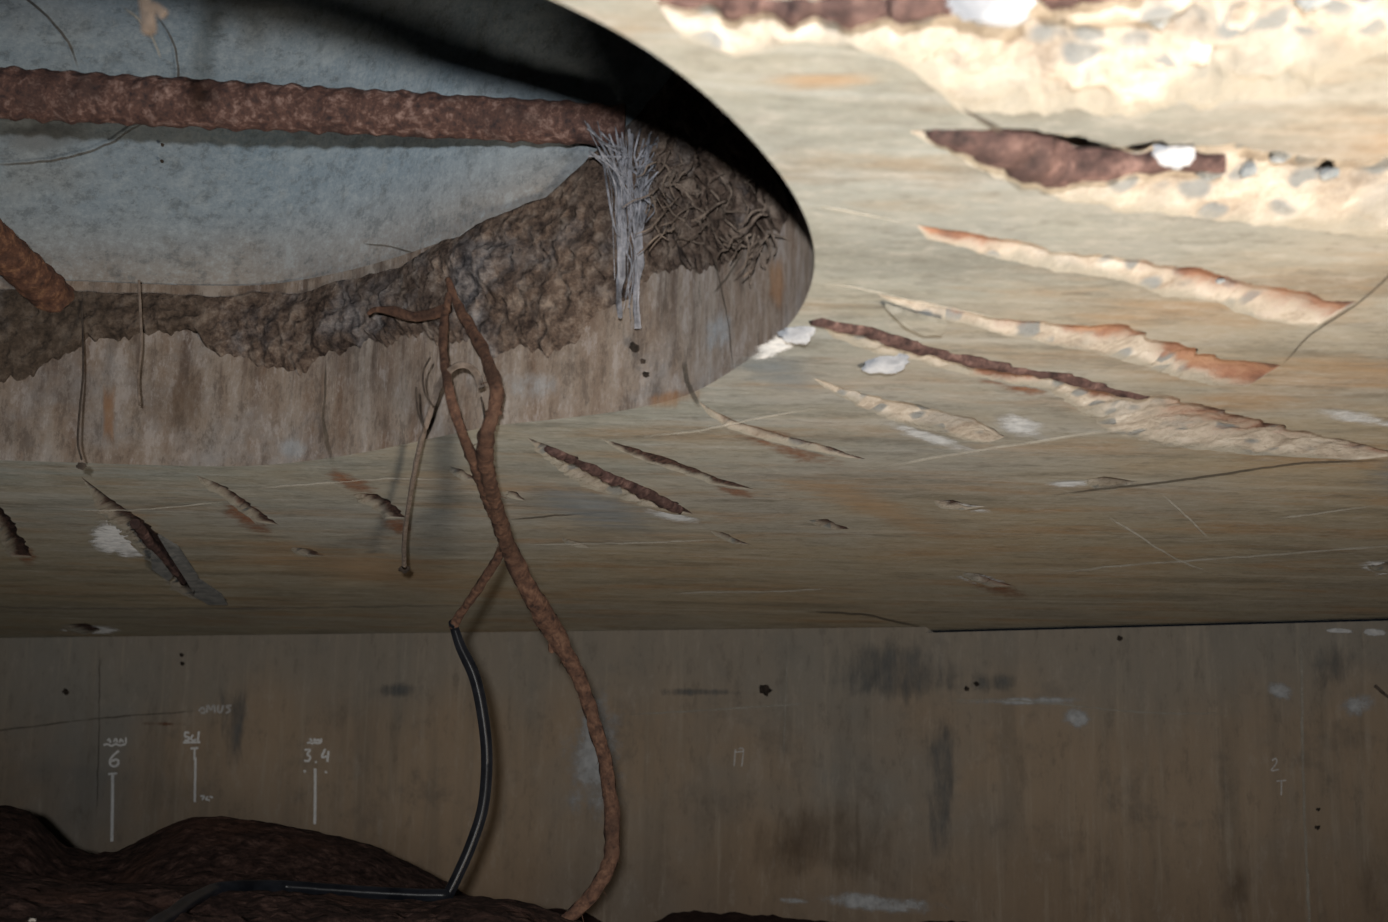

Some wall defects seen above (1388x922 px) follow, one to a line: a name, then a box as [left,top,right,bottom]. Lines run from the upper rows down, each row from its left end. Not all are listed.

spalling [0,66,626,163]
spalling [655,0,1388,238]
spalling [0,219,75,313]
spalling [916,225,1357,329]
spalling [629,341,649,377]
spalling [777,295,1388,460]
spalling [528,438,692,514]
spalling [0,507,31,557]
spalling [82,478,228,605]
water stain [1327,628,1385,636]